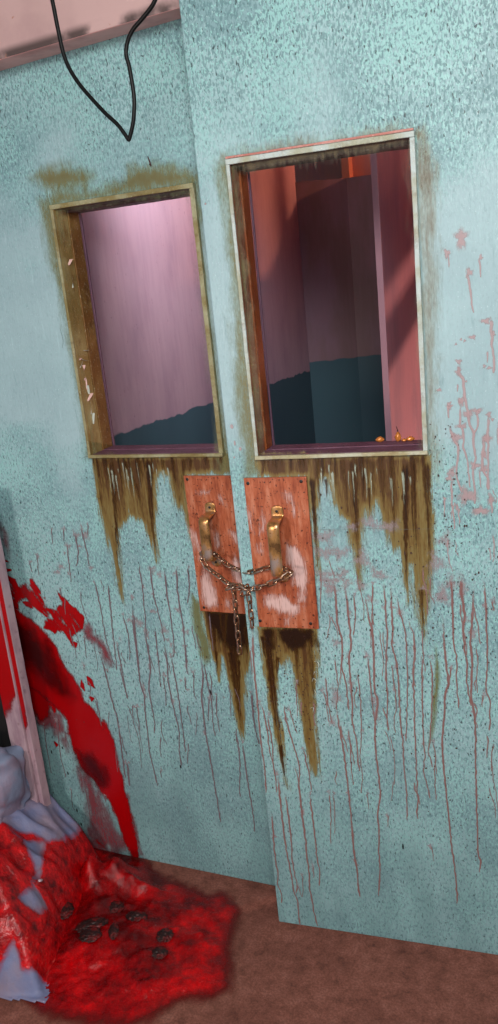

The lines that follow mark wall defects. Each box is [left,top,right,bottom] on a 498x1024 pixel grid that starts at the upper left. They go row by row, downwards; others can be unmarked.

corrosion [86,453,230,604]
corrosion [179,421,498,813]